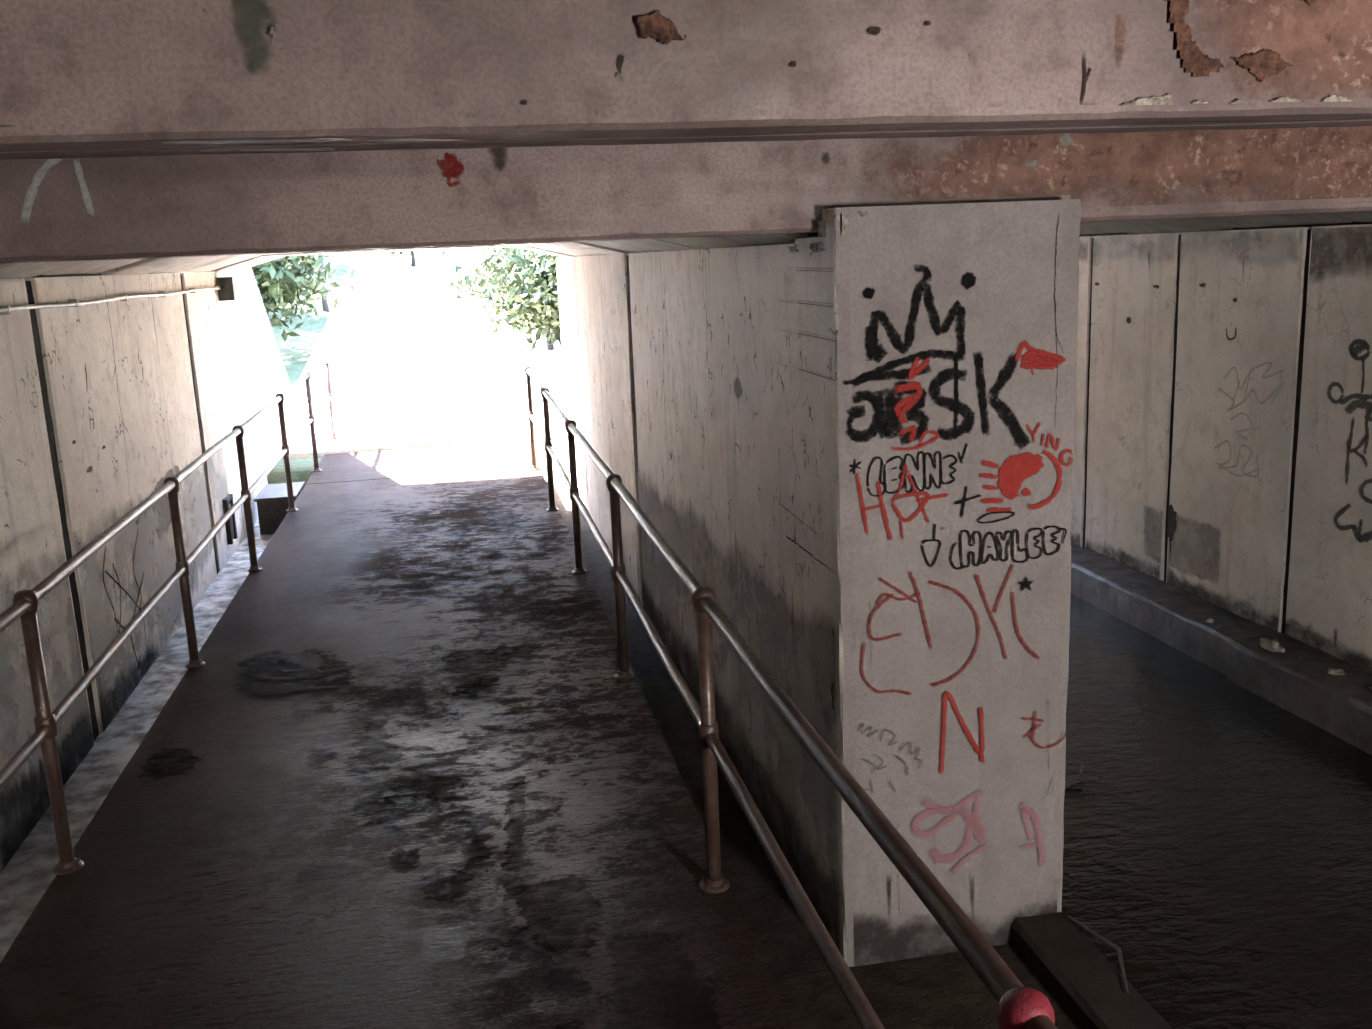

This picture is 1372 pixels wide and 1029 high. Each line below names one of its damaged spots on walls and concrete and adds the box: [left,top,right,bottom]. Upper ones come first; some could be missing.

spalling [635,9,686,45]
spalling [1165,0,1292,82]
spalling [1120,93,1173,106]
leakage [638,473,710,696]
leakage [0,459,228,868]
leakage [714,561,959,967]
leakage [974,903,1057,946]